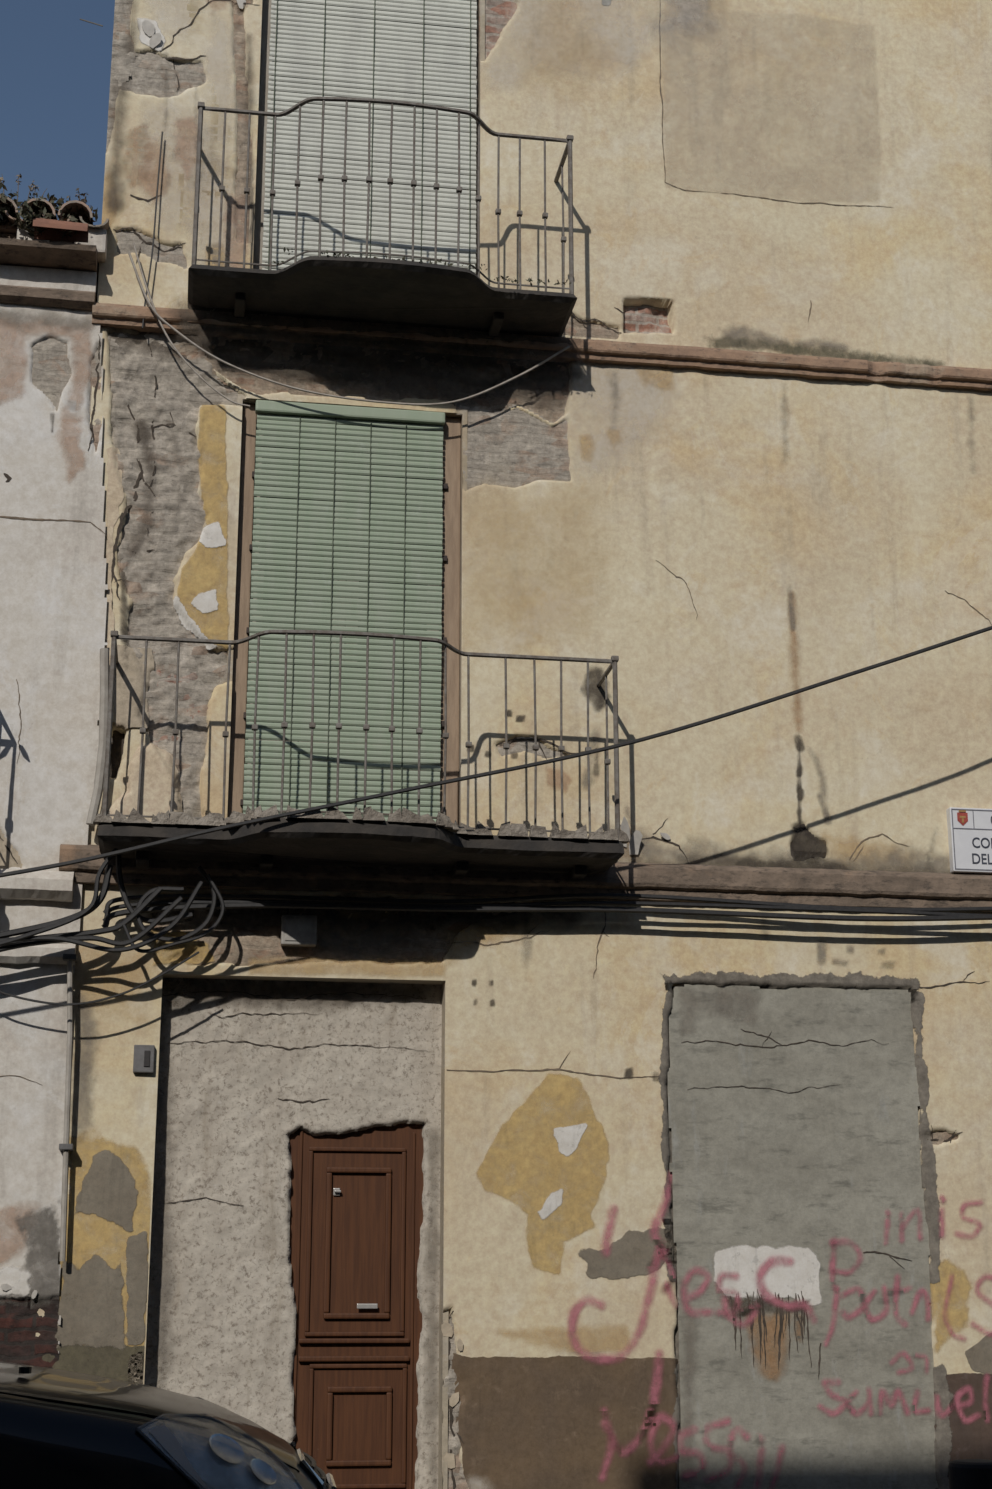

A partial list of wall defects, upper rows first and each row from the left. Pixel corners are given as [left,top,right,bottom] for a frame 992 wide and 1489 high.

flaking render [106,0,206,152]
crack [160,0,256,92]
flaking render [479,0,518,66]
flaking render [208,0,253,268]
flaking render [102,200,187,269]
flaking render [32,332,670,855]
peeling [0,1208,38,1299]
peeling [55,1136,151,1384]
peeling [477,1074,679,1364]
peeling [928,1260,971,1350]
peeling [965,1333,992,1374]